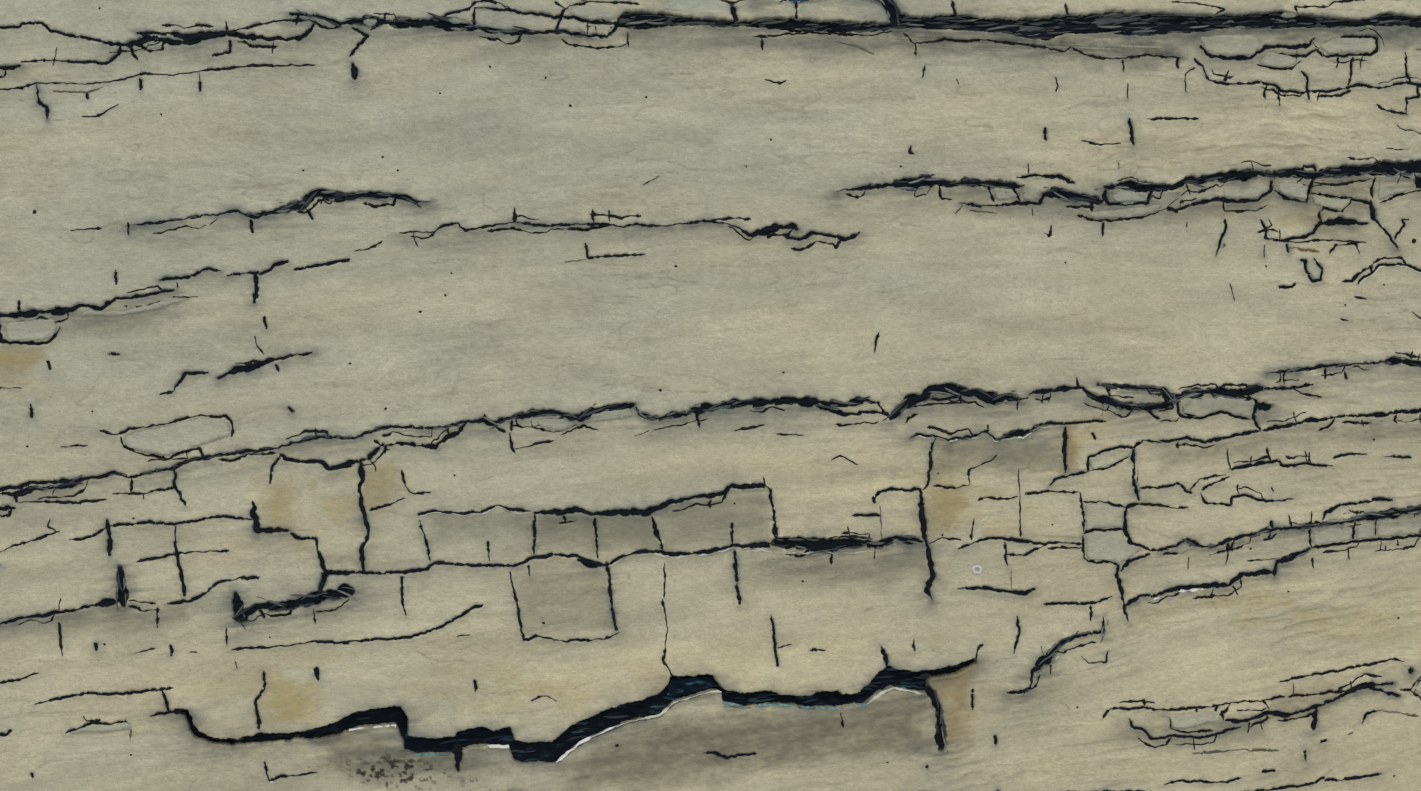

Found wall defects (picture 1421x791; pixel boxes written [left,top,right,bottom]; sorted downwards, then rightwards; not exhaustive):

crack [0,0,1421,289]
crack [0,189,1421,791]